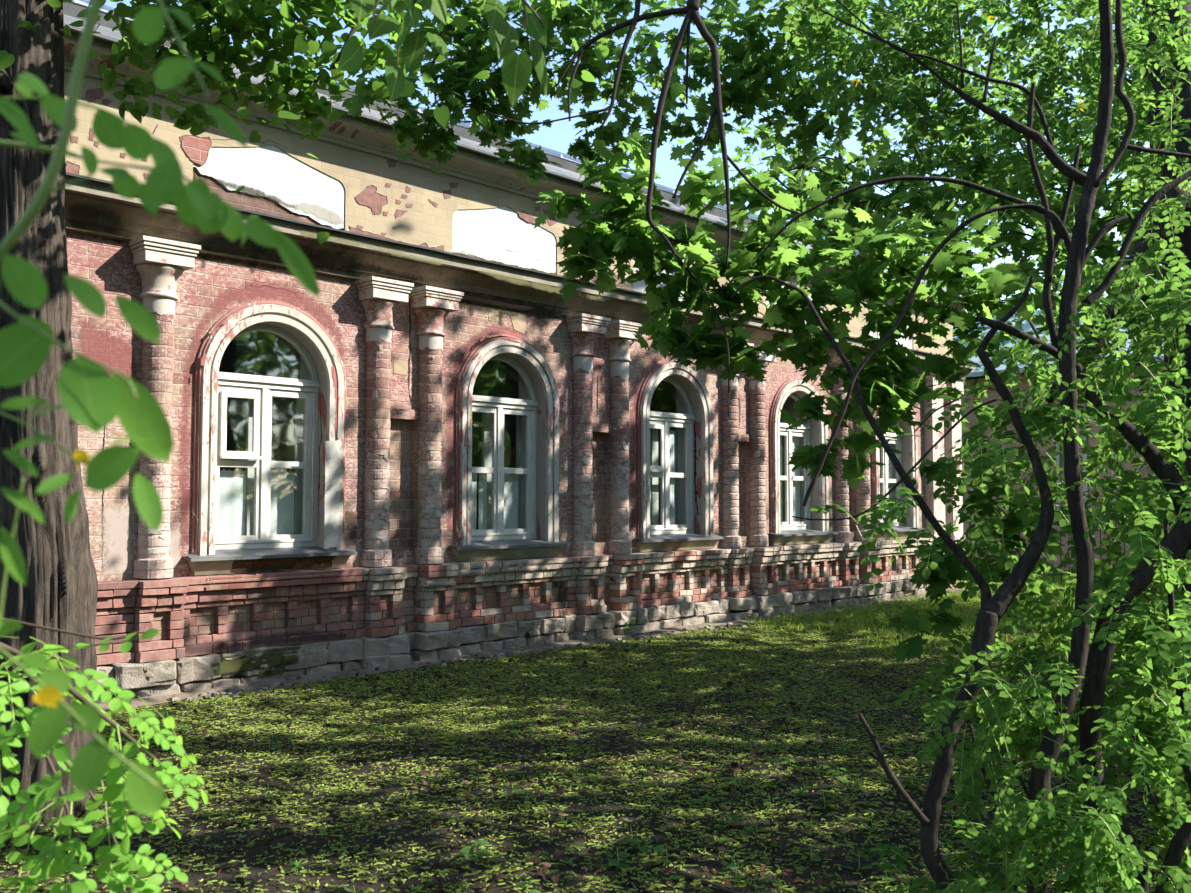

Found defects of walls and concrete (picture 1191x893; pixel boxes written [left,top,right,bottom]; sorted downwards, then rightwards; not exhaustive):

flaking render [180,134,557,275]
leakage [183,631,347,677]